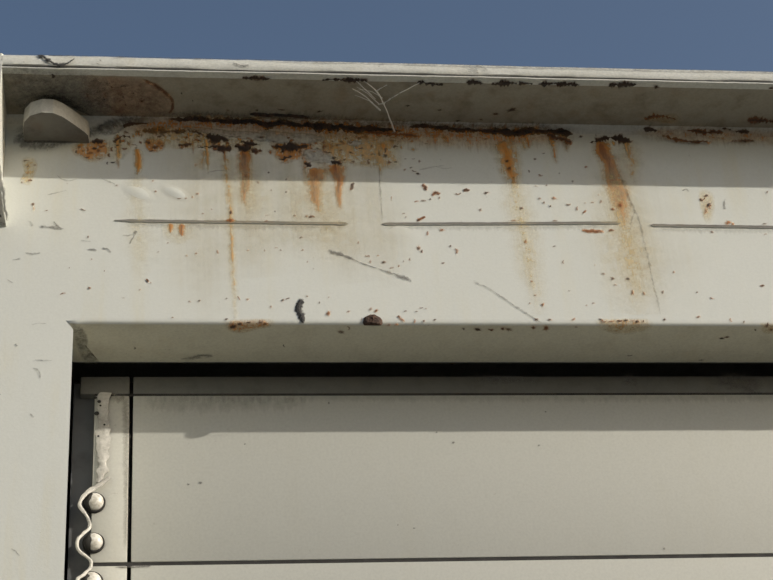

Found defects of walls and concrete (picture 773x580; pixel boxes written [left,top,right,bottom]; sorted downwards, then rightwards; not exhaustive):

rust [75,80,582,218]
rust [582,134,635,280]
rust [644,113,773,144]